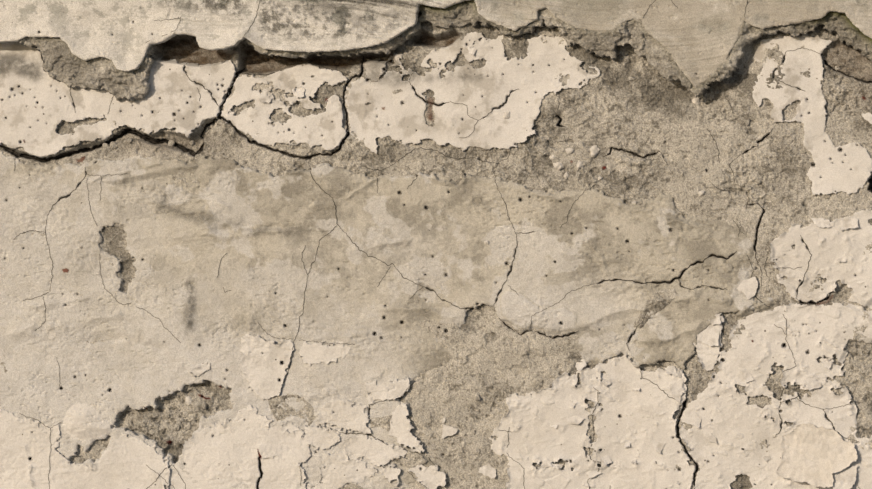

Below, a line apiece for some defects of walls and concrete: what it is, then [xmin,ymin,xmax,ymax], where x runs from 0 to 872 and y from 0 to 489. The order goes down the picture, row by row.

spalling [0,0,872,305]
crack [19,413,61,489]
crack [256,456,264,489]
crack [0,56,860,445]
peeling [409,308,696,489]
spalling [634,289,678,329]
crack [626,312,698,487]
peeling [679,209,872,489]